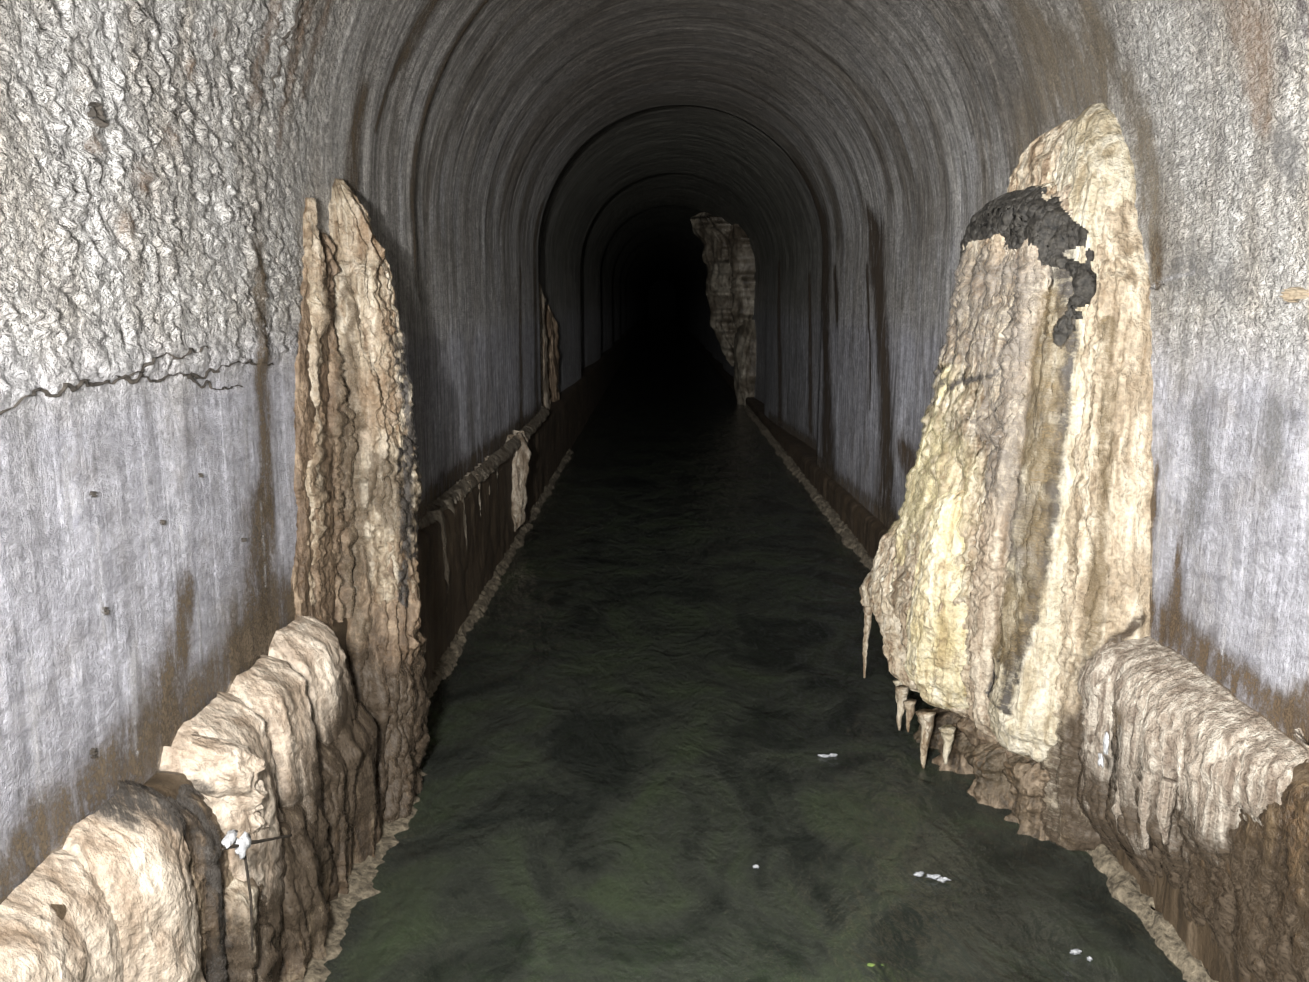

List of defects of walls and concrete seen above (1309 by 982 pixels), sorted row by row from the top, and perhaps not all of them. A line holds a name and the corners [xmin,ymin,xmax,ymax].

damp [346,0,439,195]
damp [410,0,488,286]
crack [0,346,274,415]
damp [0,244,381,982]
damp [390,205,560,611]
damp [690,212,757,405]
damp [859,0,1309,982]